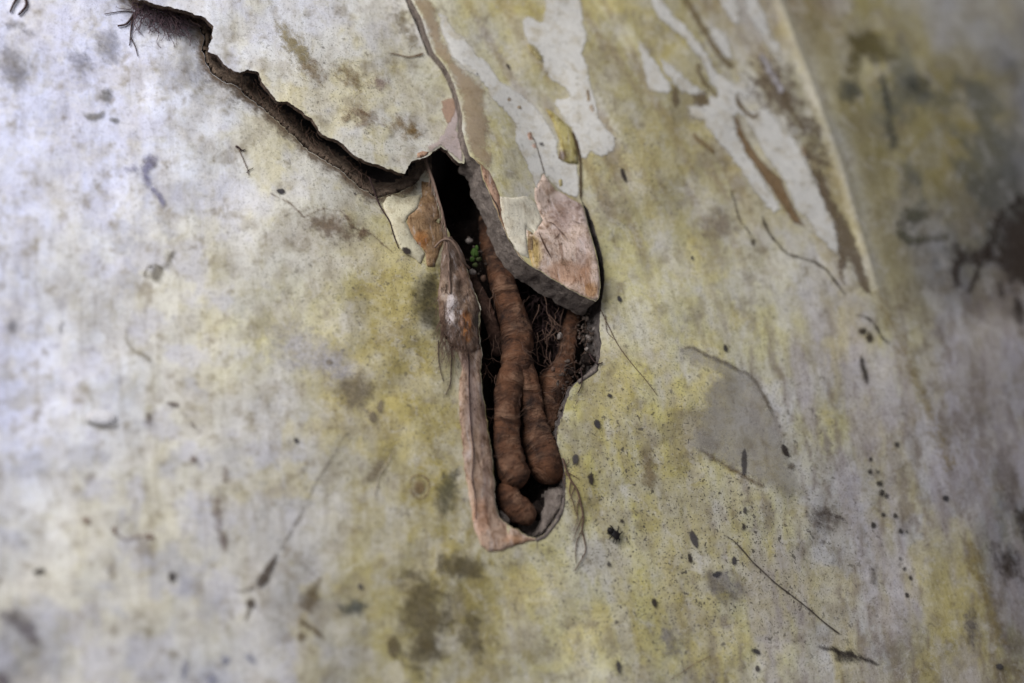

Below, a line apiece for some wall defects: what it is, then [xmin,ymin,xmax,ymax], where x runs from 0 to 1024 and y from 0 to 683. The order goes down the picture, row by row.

crack [120,0,443,202]
peeling [638,0,840,259]
flaking render [133,0,615,552]